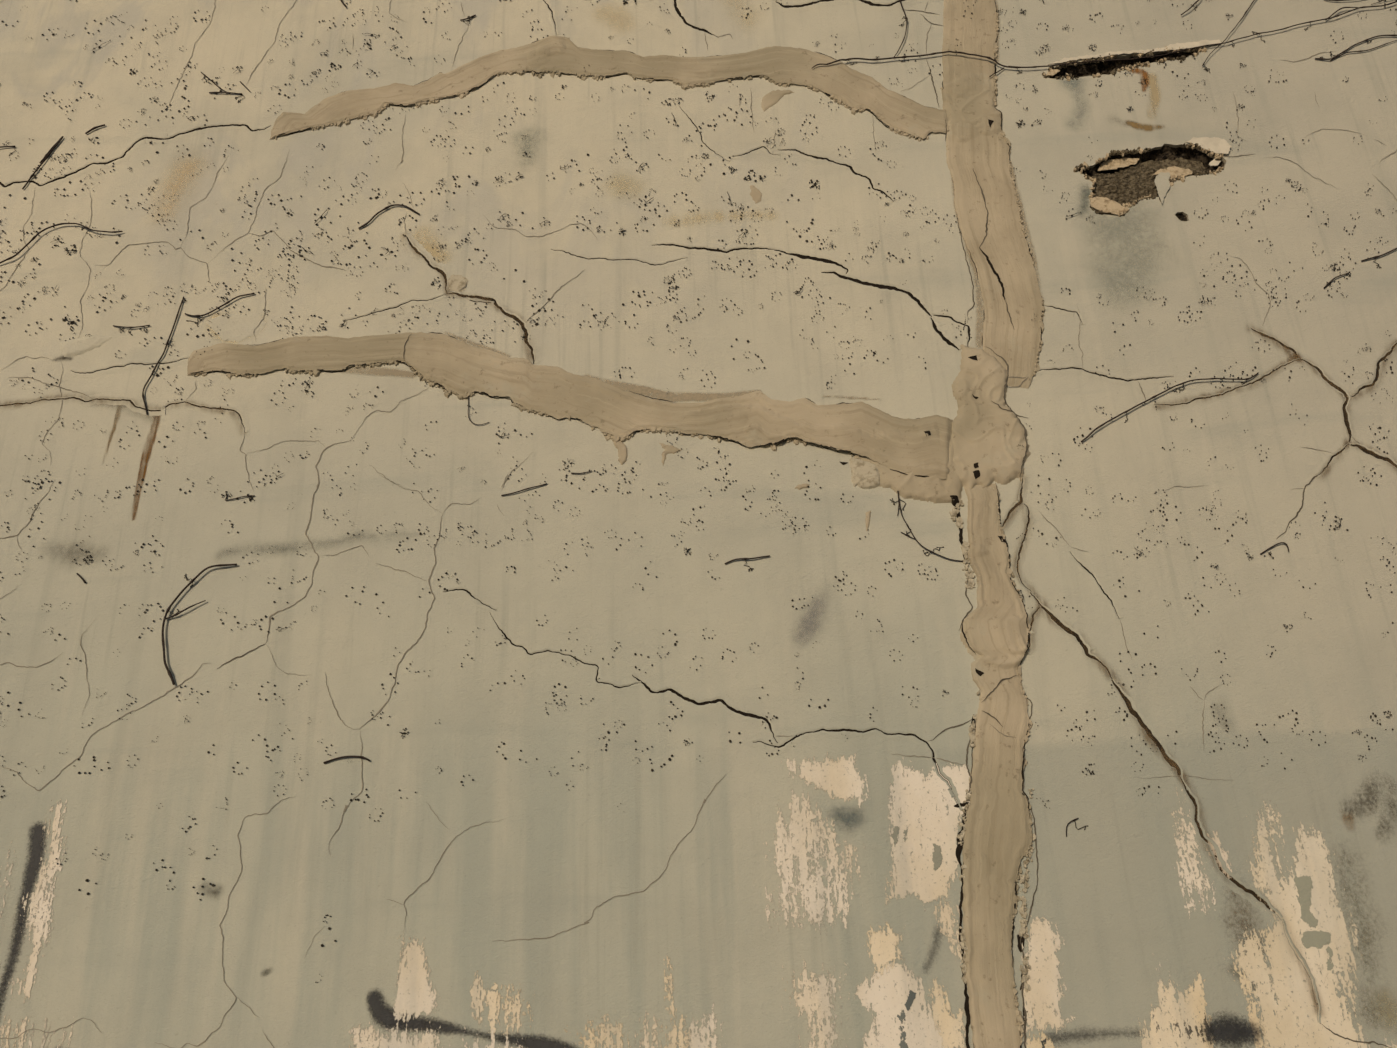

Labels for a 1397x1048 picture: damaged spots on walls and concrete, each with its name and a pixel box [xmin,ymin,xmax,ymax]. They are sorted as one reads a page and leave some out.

spalling [1042,40,1221,81]
crack [0,119,272,291]
spalling [1073,137,1231,221]
crack [0,367,250,434]
rust [133,416,160,520]
crack [69,233,964,529]
crack [1154,257,1397,537]
crack [217,440,369,674]
peeling [336,934,535,1048]
peeling [781,758,973,1048]
peeling [1017,915,1078,1048]
peeling [1170,787,1397,1048]